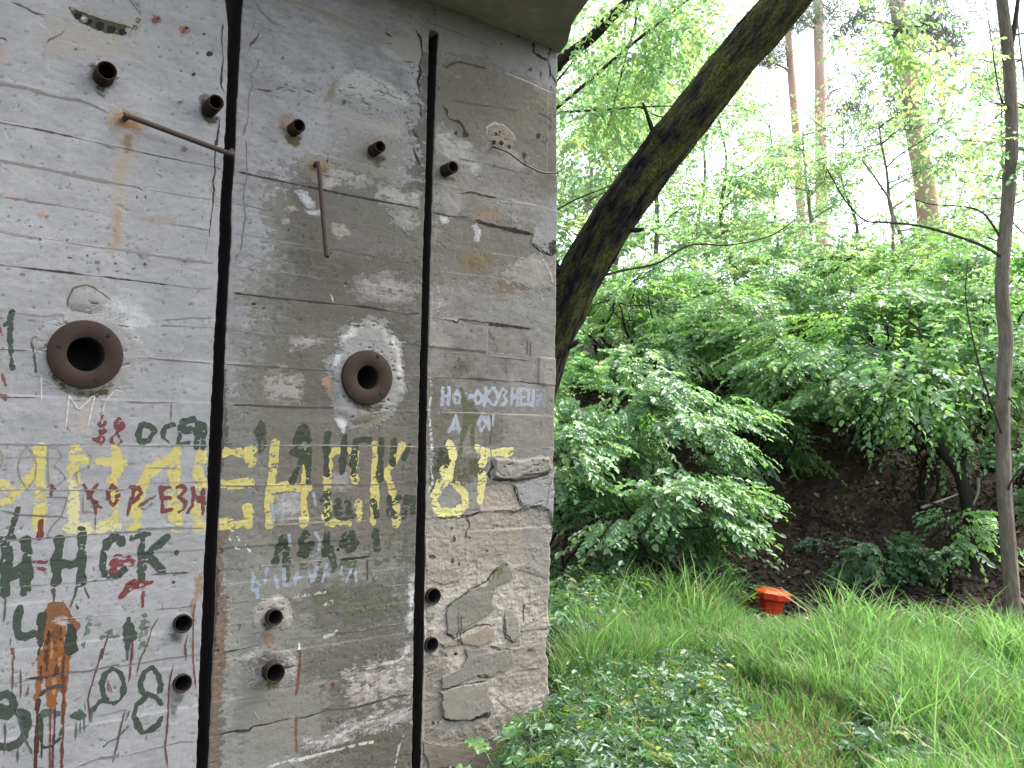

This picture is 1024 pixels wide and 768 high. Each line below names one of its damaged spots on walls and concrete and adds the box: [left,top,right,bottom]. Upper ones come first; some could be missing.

corrosion [101,104,150,254]
crack [205,3,313,261]
crack [384,31,467,165]
spalling [421,481,552,768]